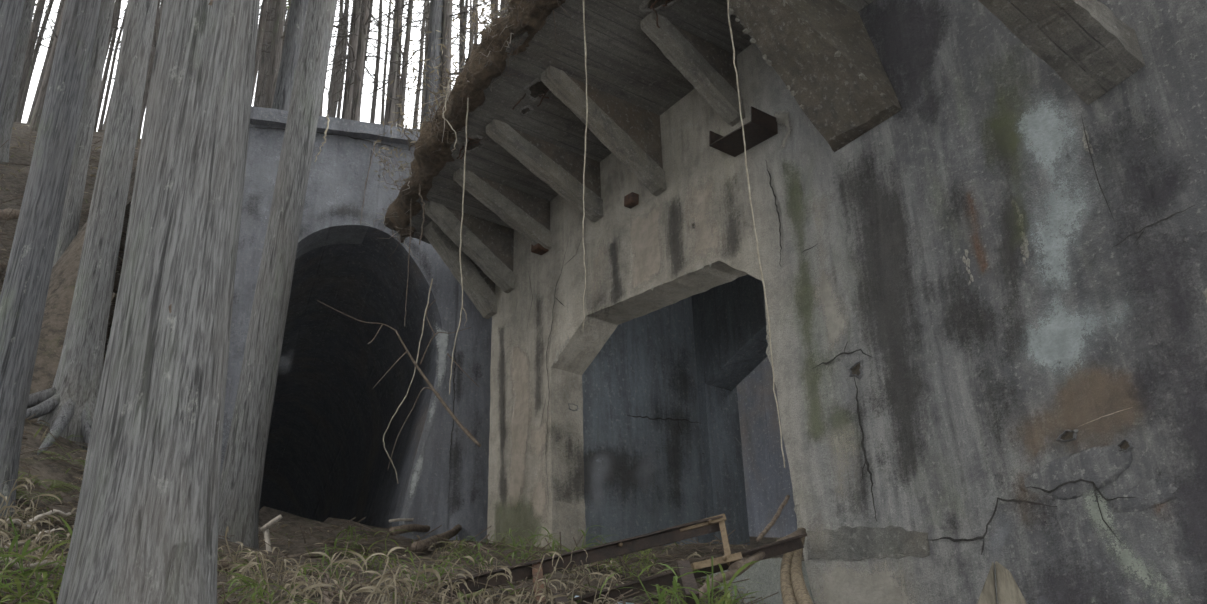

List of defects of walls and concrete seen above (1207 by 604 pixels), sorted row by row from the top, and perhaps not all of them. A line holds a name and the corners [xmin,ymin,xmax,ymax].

damp [860,0,947,121]
crack [1081,115,1195,247]
damp [812,96,1207,571]
crack [812,342,877,521]
crack [931,479,1136,555]